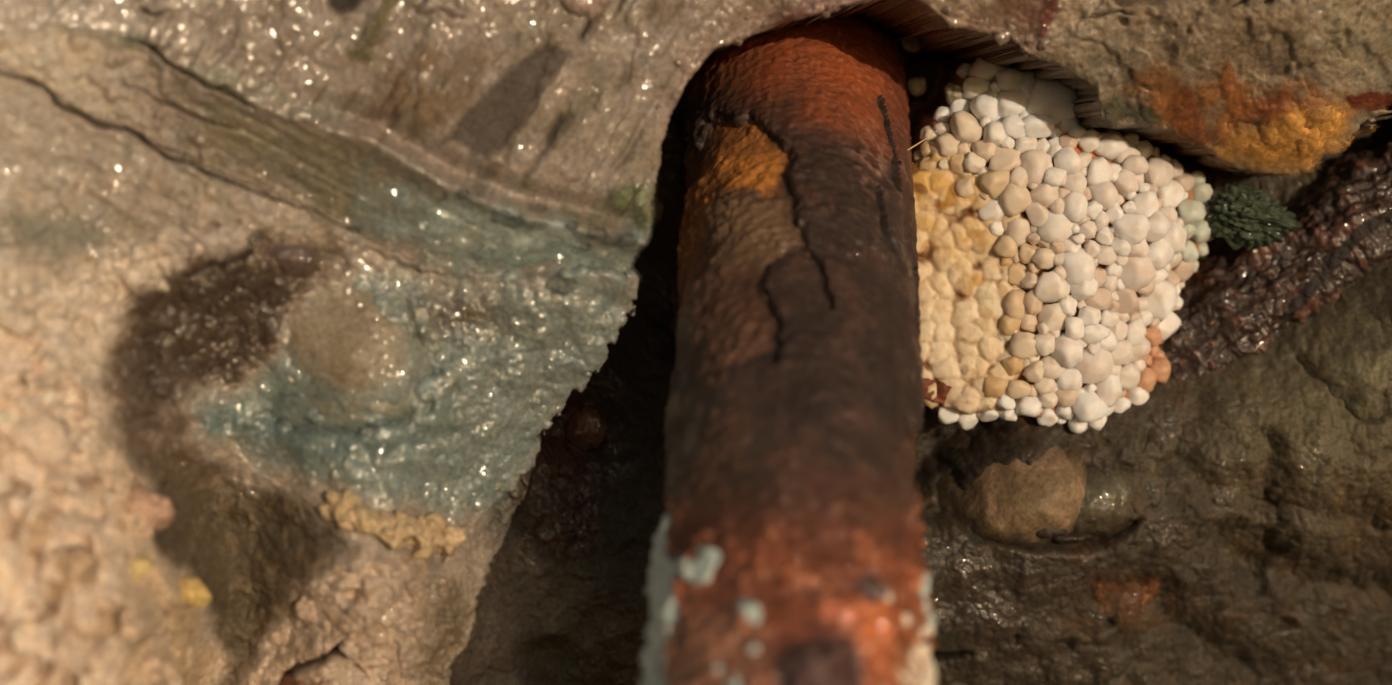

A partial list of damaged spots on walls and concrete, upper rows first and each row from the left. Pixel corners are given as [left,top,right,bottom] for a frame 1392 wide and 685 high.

crack [1,73,307,210]
crack [111,7,256,131]
spalling [650,0,1050,228]
damp [1095,96,1160,128]
rust [1137,64,1328,145]
rust [1346,93,1392,111]
rust [1158,137,1392,384]
spalling [902,389,1392,685]
peeling [737,599,761,624]
rust [773,569,889,685]